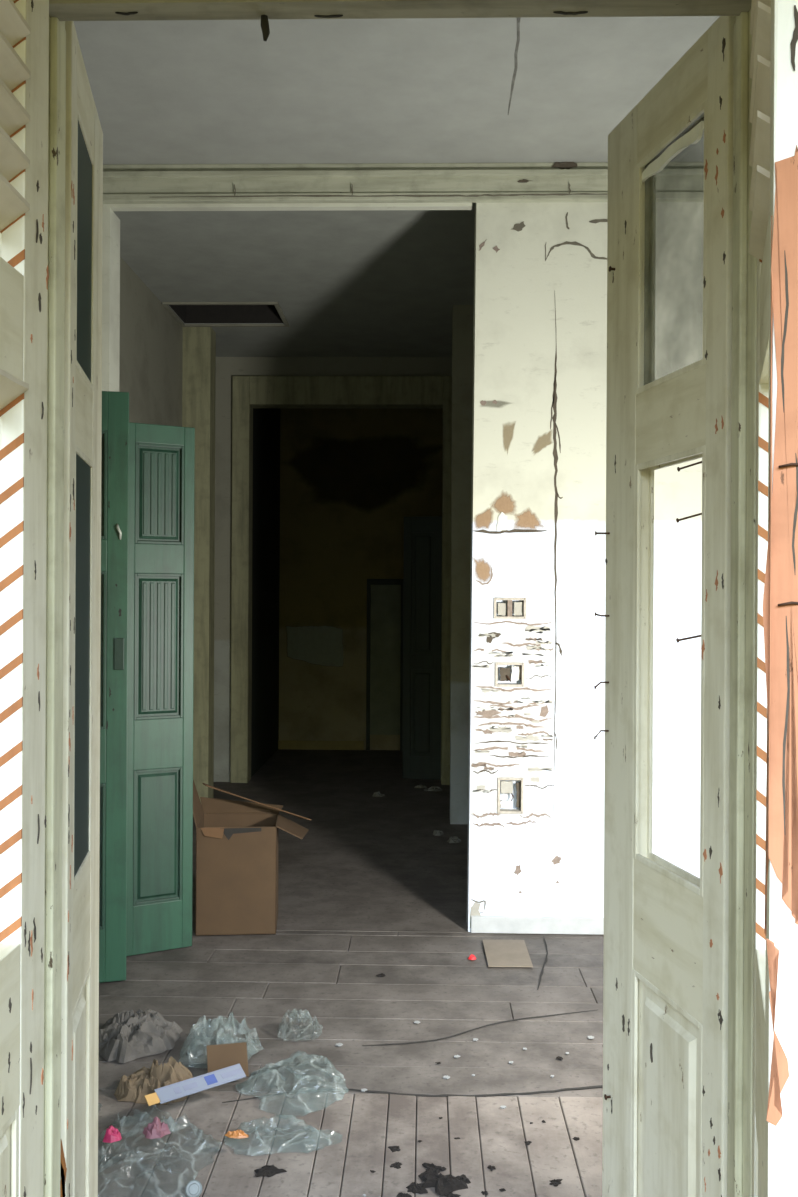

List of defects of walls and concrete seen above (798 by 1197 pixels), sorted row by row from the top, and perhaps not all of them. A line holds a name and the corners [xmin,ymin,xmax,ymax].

peeling [471,621,554,827]
crack [550,309,563,769]